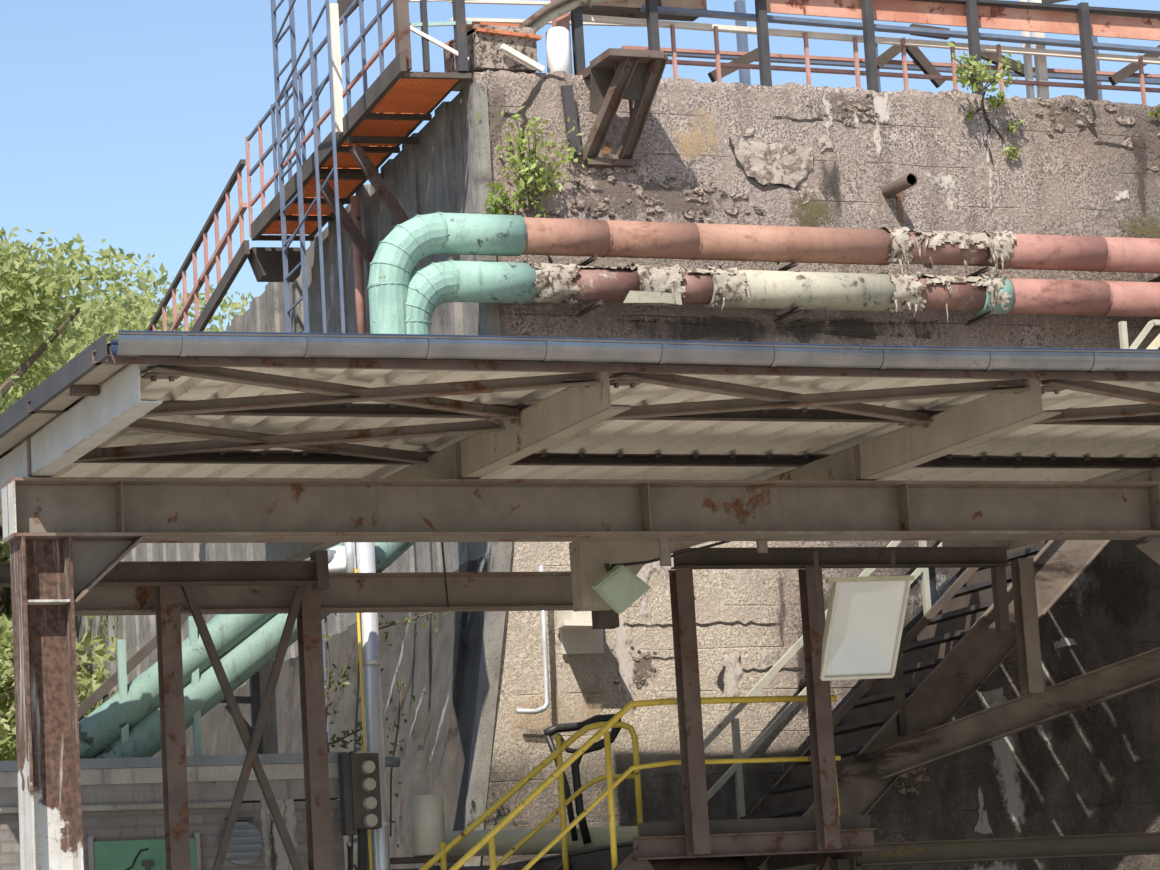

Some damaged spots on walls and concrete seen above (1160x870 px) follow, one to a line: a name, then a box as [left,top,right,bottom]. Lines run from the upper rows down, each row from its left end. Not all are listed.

spalling [806,93,880,127]
spalling [547,127,833,224]
crack [624,620,779,628]
water stain [1041,656,1072,688]
water stain [980,687,1007,708]
water stain [990,695,1134,824]
water stain [971,861,1018,870]